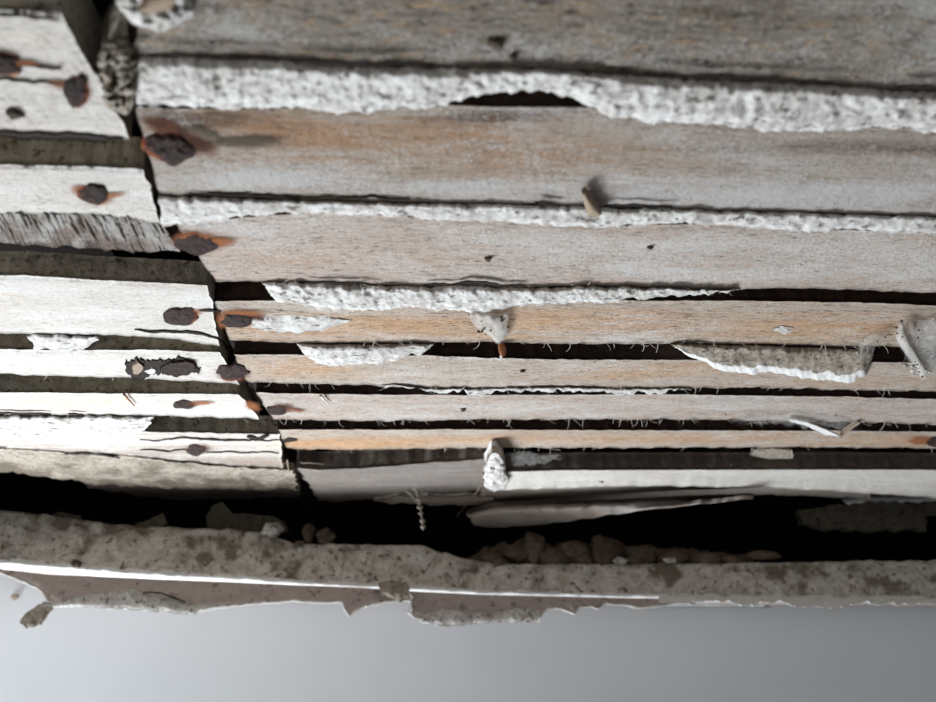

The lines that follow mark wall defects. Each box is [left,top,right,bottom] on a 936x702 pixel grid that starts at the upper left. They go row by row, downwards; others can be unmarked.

spalling [97,0,936,134]
corrosion [143,118,215,156]
spalling [158,193,936,233]
corrosion [175,233,234,246]
spalling [27,333,100,353]
peeling [132,360,195,377]
corrosion [218,311,269,327]
spalling [251,281,740,366]
spalling [669,343,874,383]
spalling [0,414,299,491]
spalling [483,440,508,491]
peeling [0,569,936,629]